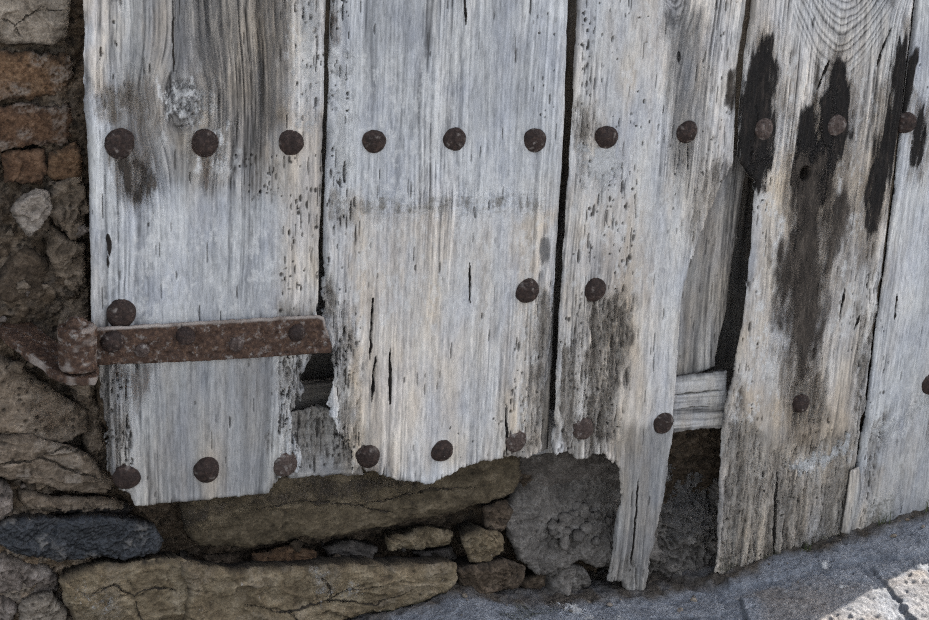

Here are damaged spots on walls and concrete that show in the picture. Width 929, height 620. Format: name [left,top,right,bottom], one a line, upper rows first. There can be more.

crack [877,29,891,66]
water stain [725,71,737,110]
water stain [902,47,919,113]
water stain [749,156,767,194]
water stain [768,88,850,381]